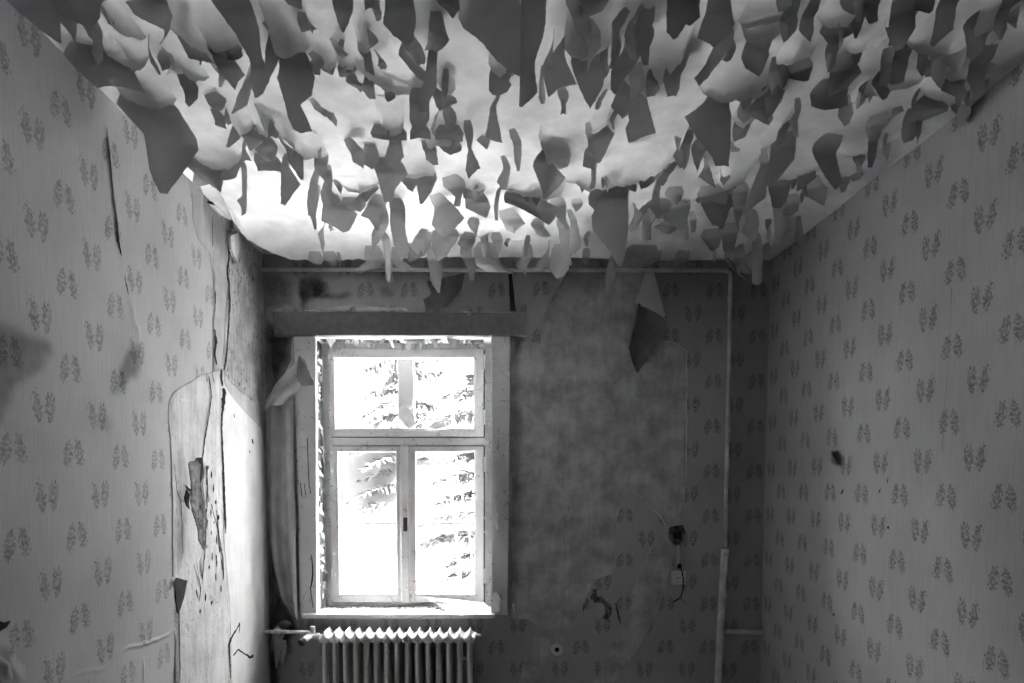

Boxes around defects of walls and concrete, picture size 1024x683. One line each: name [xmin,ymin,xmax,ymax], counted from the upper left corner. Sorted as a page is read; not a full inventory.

peeling [6,0,1024,427]
spalling [184,457,222,614]
crack [174,218,235,601]
spalling [583,589,621,624]